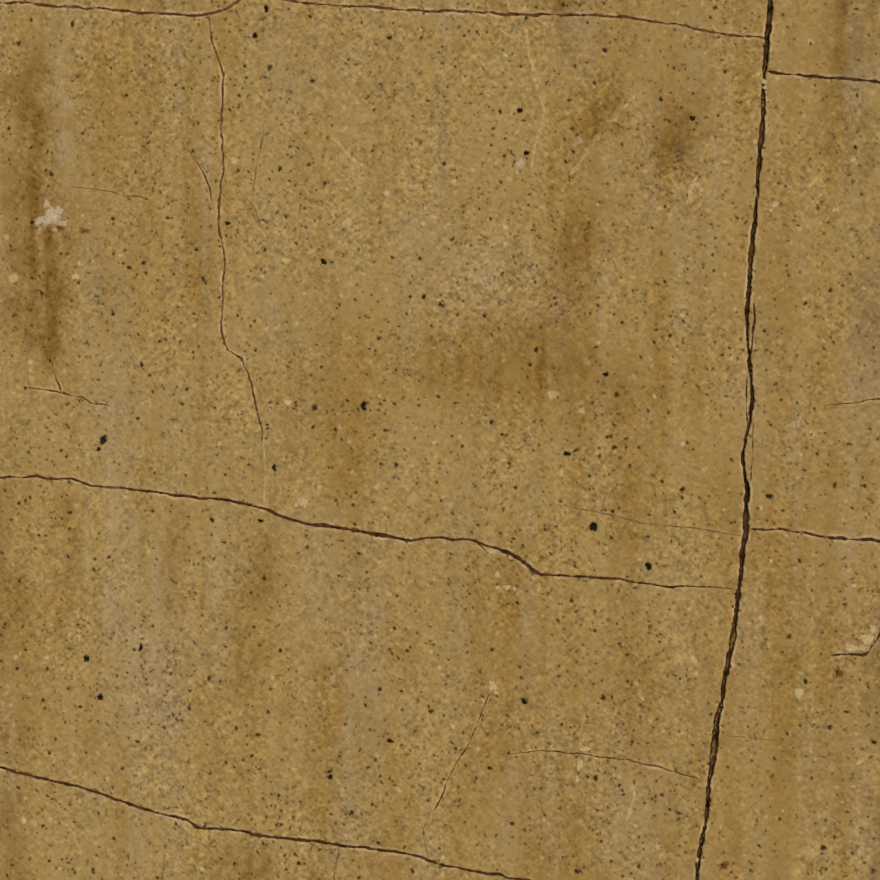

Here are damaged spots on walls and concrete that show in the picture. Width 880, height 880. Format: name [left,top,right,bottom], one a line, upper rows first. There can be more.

crack [286,0,880,84]
crack [0,0,263,442]
crack [247,120,268,238]
crack [0,475,712,588]
crack [665,525,740,536]
crack [696,84,880,880]
crack [0,695,530,880]
crack [512,750,698,779]